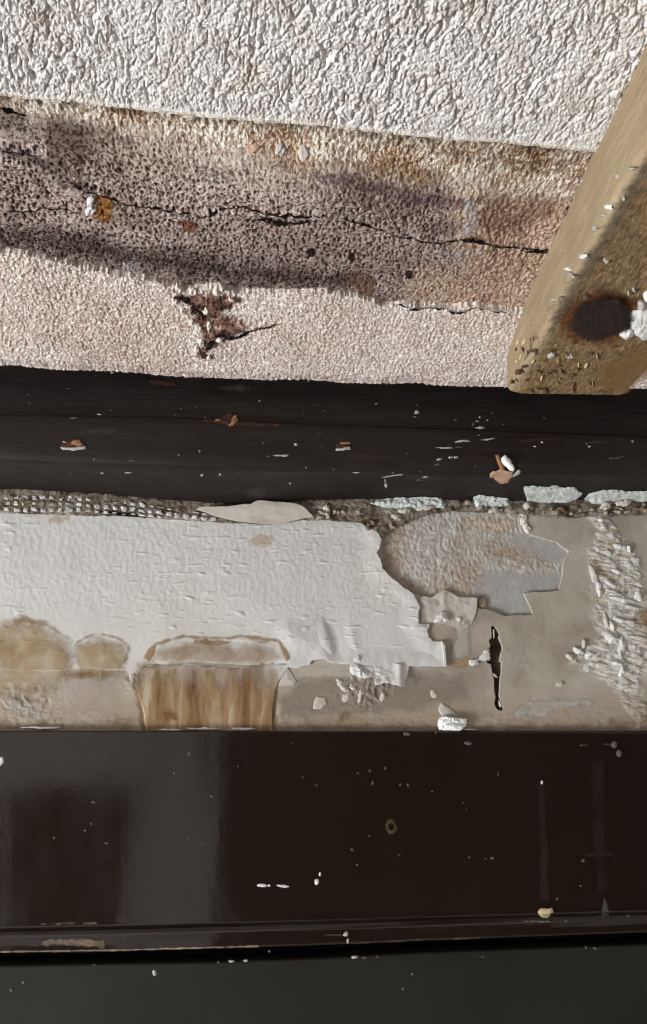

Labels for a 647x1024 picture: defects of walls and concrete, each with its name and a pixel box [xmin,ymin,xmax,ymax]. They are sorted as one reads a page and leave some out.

crack [1,107,27,117]
water stain [0,149,81,186]
water stain [0,228,375,297]
crack [9,183,549,254]
flaking render [0,93,597,361]
water stain [311,163,552,234]
peeling [490,454,521,484]
peeling [0,500,567,709]
water stain [0,618,129,694]
water stain [134,636,462,731]